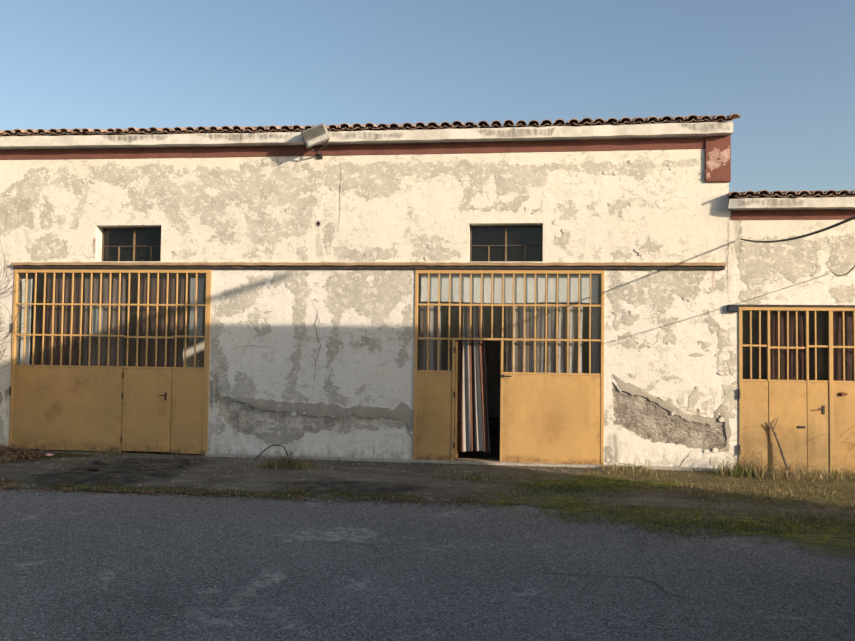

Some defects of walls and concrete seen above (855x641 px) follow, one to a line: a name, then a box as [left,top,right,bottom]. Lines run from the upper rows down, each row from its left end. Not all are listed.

crack [311,299,322,390]
peeling [0,146,737,454]
peeling [736,232,855,304]